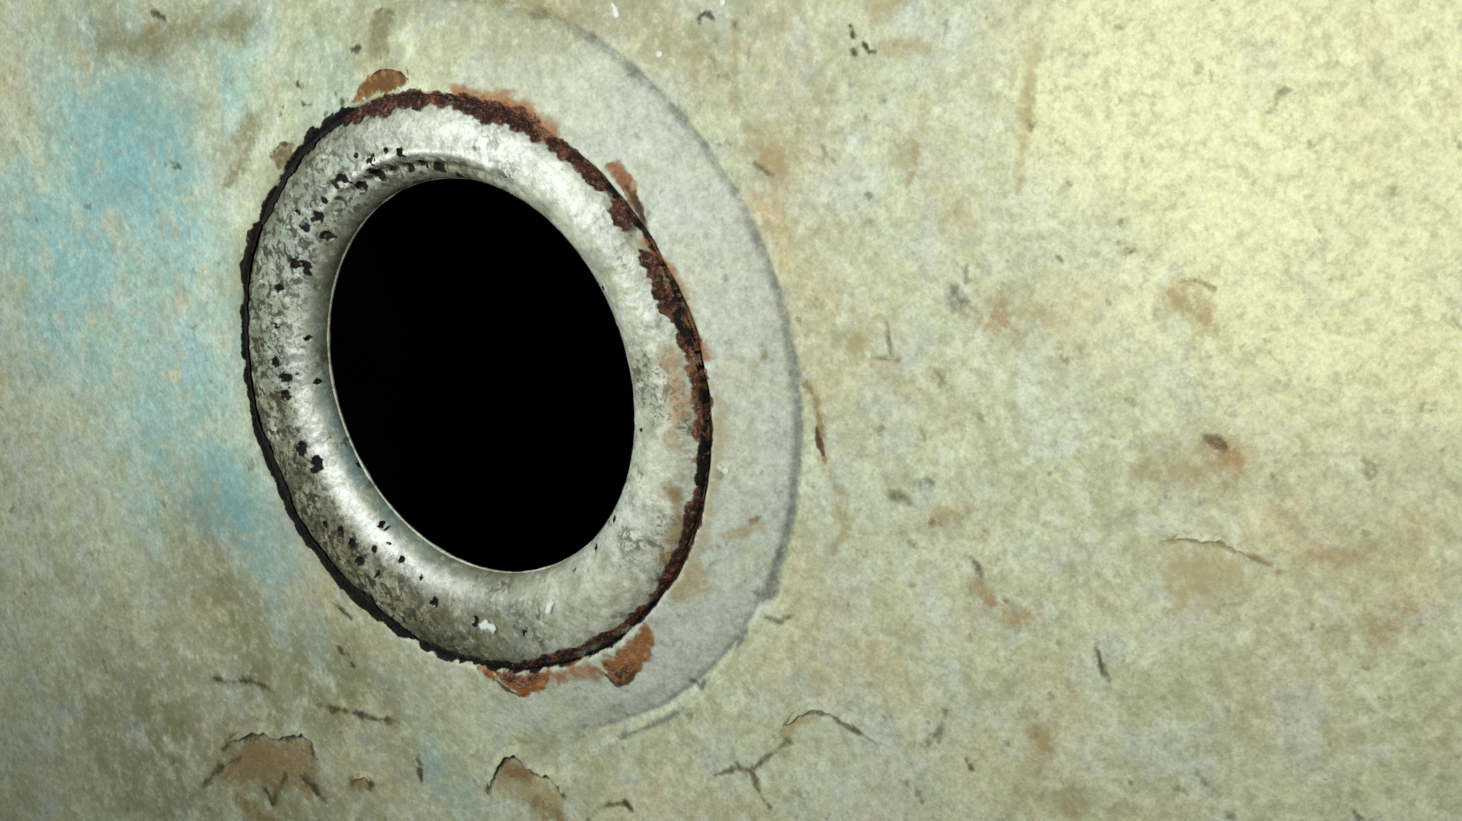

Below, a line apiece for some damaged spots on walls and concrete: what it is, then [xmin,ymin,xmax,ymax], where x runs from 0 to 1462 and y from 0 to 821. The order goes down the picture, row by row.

rust [239,61,713,698]
peeling [484,745,568,821]
crack [719,699,865,808]